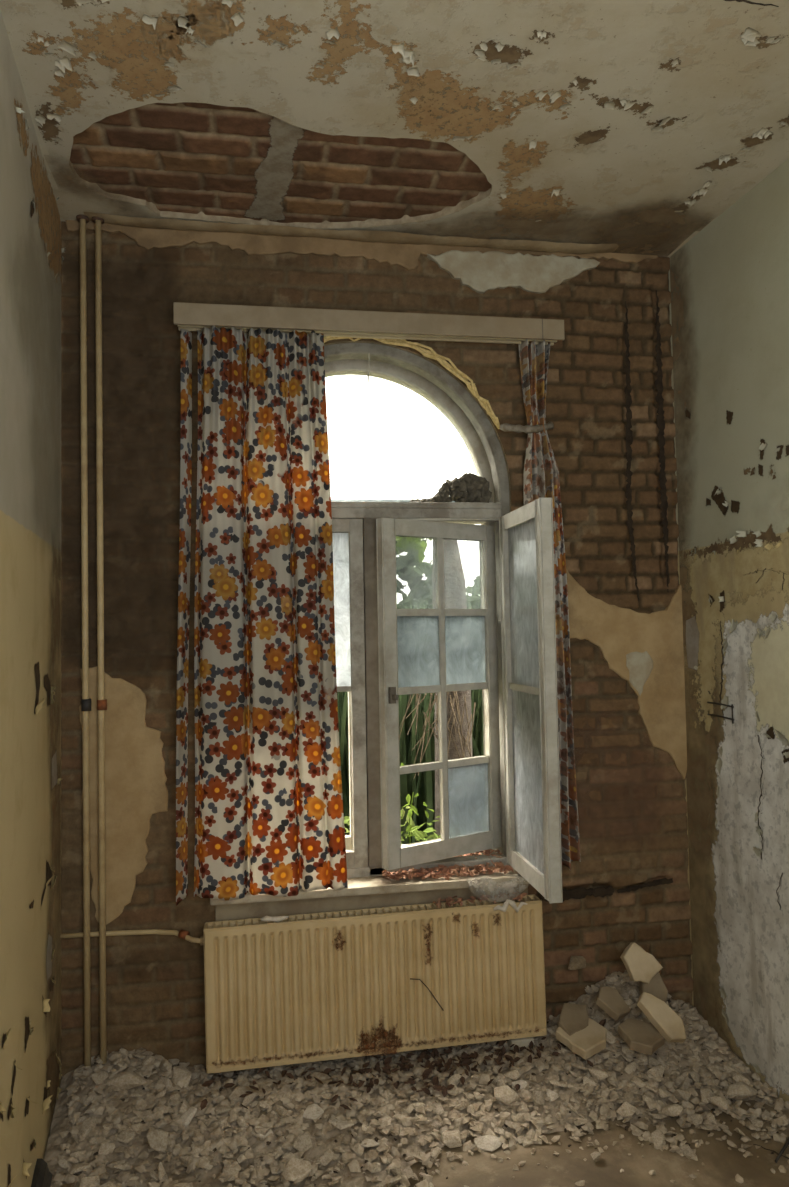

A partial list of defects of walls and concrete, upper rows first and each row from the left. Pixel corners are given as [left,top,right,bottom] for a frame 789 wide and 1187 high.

flaking render [14,0,687,284]
leakage [401,202,709,543]
peeling [34,662,55,715]
flaking render [680,524,789,1096]
peeling [29,862,57,909]
peeling [42,935,56,1014]
peeling [0,1017,62,1122]